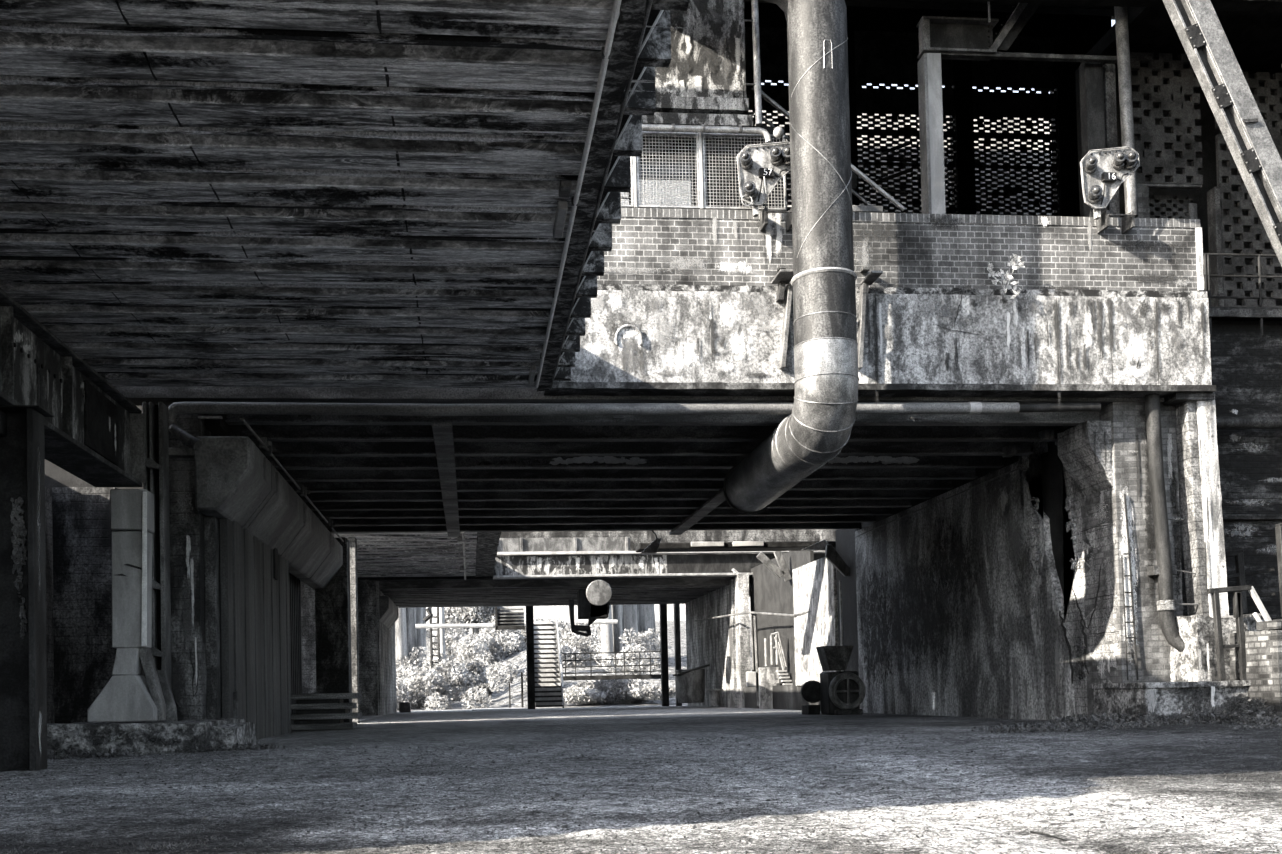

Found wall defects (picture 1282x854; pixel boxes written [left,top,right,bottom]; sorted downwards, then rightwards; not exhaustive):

water stain [679,76,702,93]
water stain [1087,221,1185,251]
water stain [945,338,958,370]
water stain [1006,273,1205,406]
crack [1059,565,1119,684]